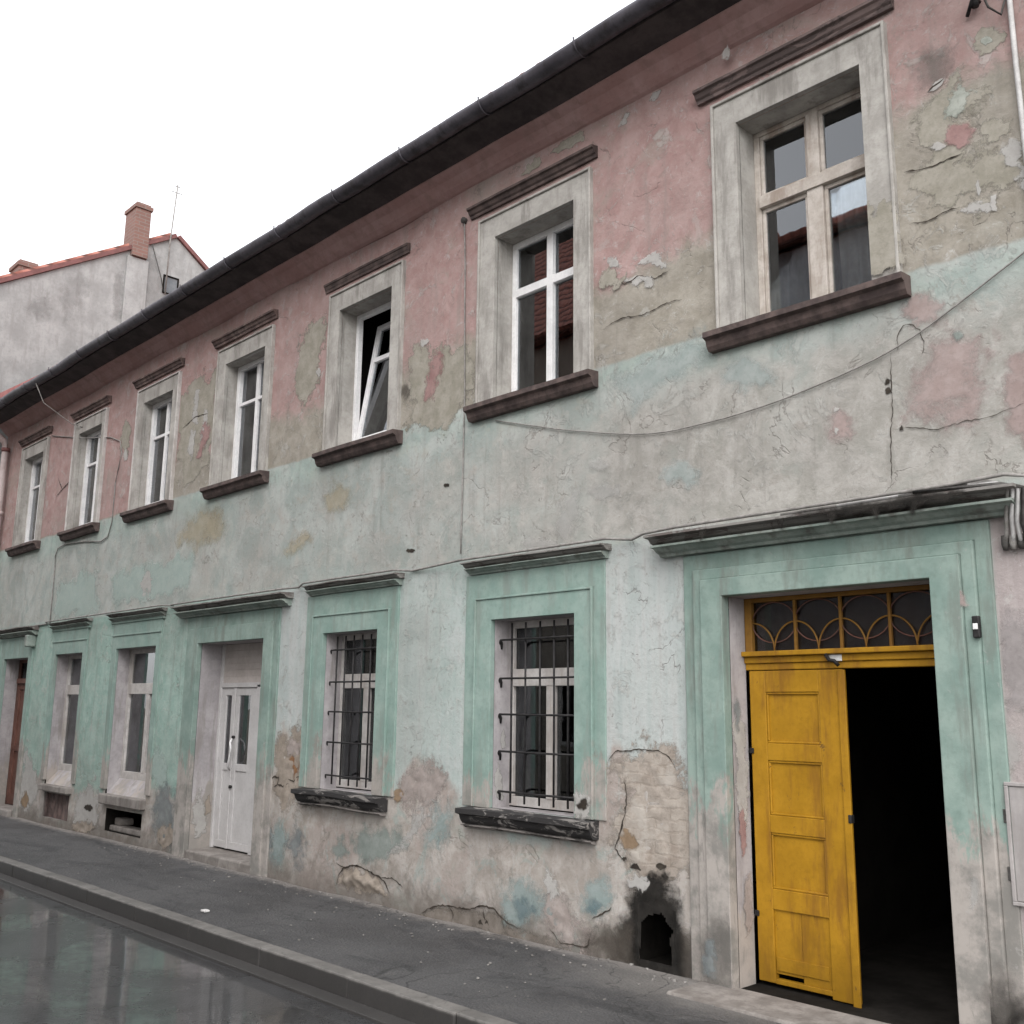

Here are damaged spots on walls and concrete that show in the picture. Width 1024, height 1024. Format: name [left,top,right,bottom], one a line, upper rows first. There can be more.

peeling [867,66,1024,275]
peeling [599,251,667,292]
crack [606,300,676,327]
crack [890,324,1023,486]
peeling [273,724,304,812]
peeling [394,756,448,816]
spalling [607,729,690,893]
crack [336,864,402,892]
water stain [639,872,667,901]
crack [423,904,522,930]